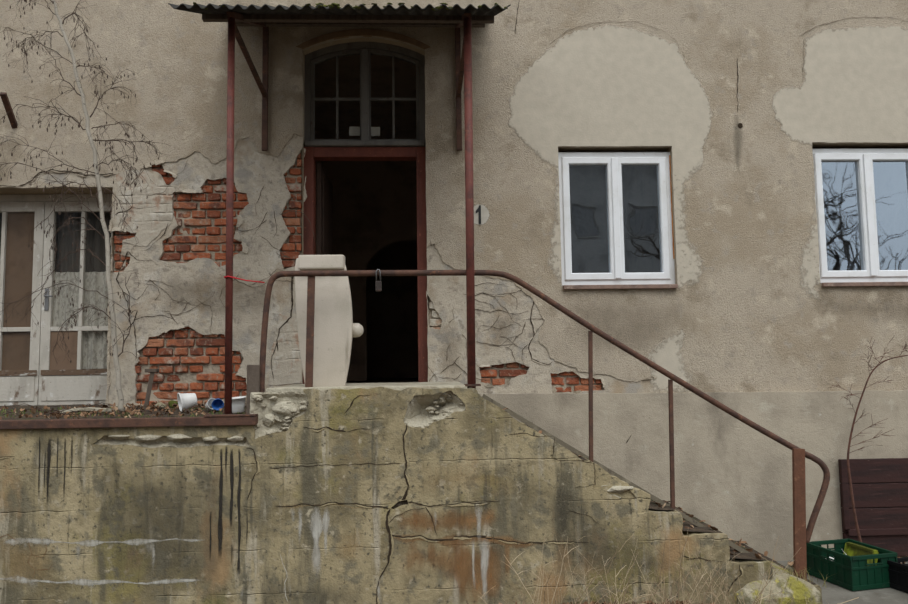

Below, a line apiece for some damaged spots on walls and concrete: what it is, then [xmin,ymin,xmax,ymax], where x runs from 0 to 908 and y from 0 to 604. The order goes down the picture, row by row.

crack [514,1,522,34]
flaking render [36,134,309,448]
flaking render [403,238,660,428]
crack [304,395,369,433]
water stain [38,438,73,499]
water stain [209,447,248,573]
water stain [299,512,329,566]
crack [247,425,599,604]
water stain [472,547,488,592]
rust [430,537,531,593]